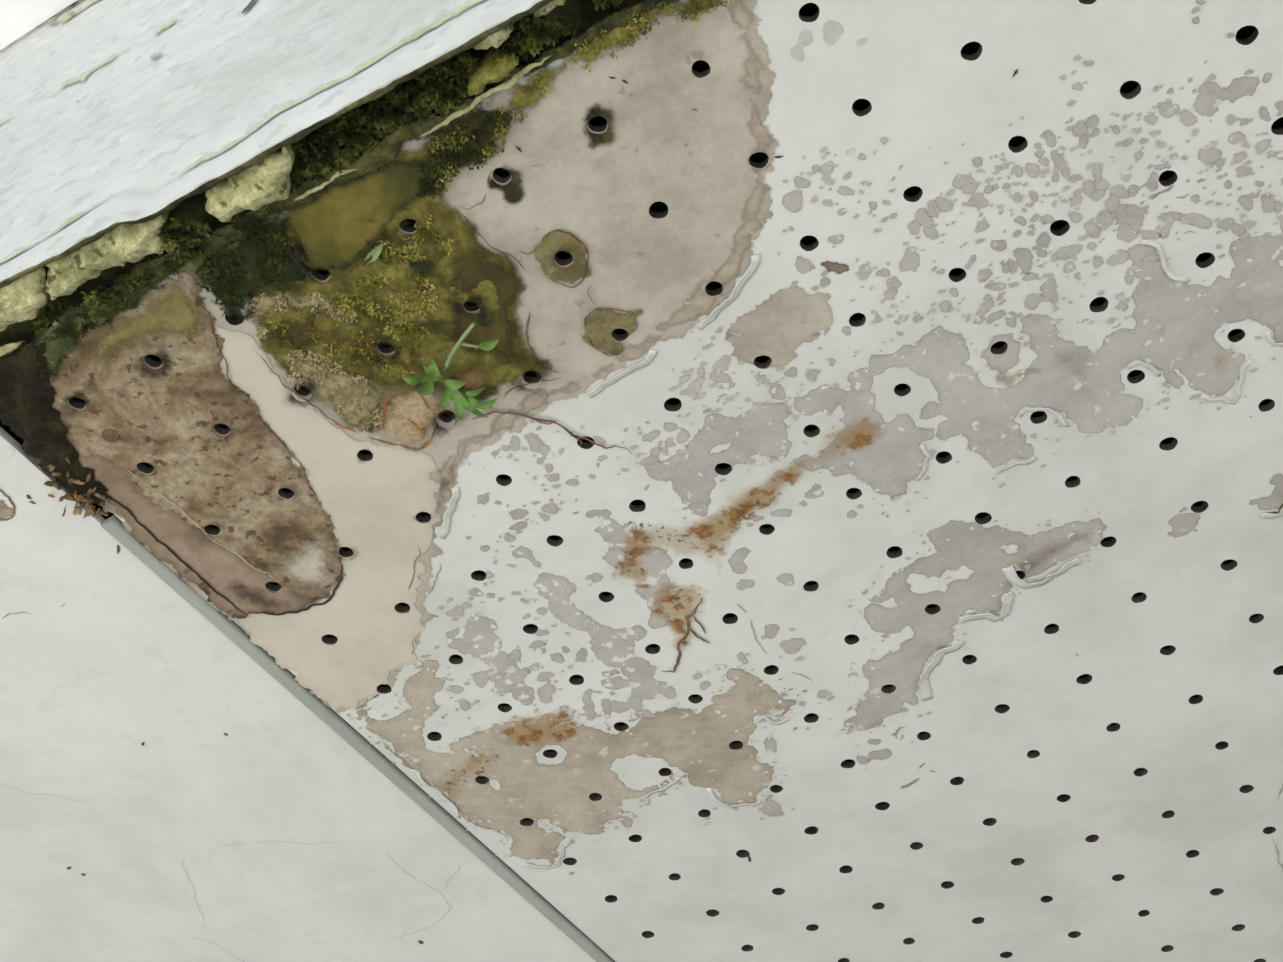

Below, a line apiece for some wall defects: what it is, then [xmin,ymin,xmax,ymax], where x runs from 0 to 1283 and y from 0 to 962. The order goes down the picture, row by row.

damp [504,0,679,83]
damp [584,104,614,148]
damp [488,168,523,203]
damp [519,229,642,357]
damp [0,92,487,619]
crack [471,411,633,455]
peeling [156,0,1283,875]
corrosion [848,433,871,449]
peeling [100,500,132,534]
corrosion [615,473,794,587]
corrosion [655,586,692,644]
corrosion [504,713,578,746]